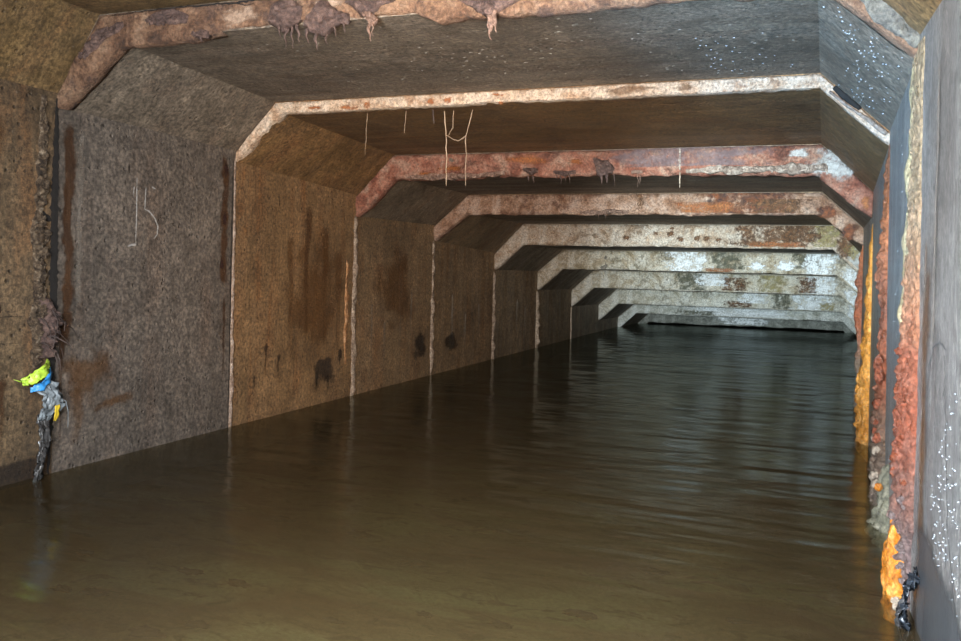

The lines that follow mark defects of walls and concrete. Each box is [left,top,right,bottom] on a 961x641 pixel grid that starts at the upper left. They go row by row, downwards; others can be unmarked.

damp [228,161,236,434]
damp [350,216,359,401]